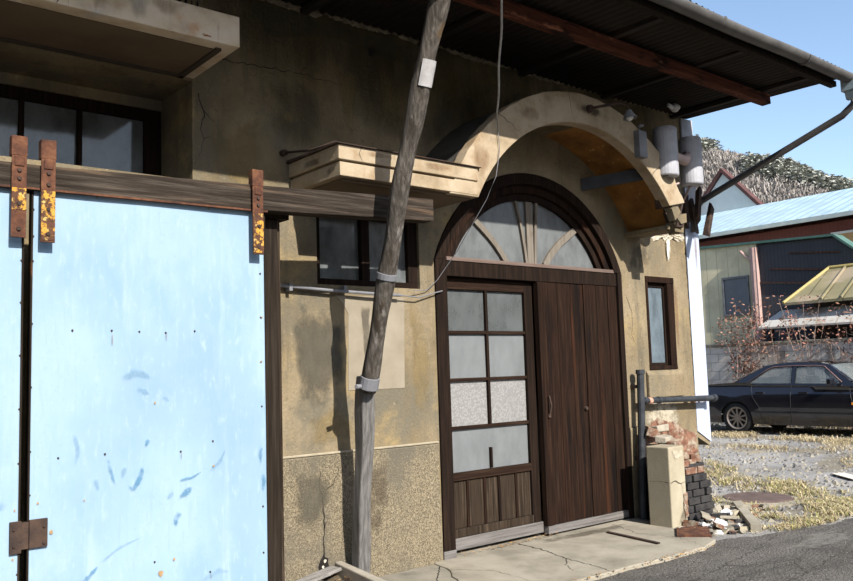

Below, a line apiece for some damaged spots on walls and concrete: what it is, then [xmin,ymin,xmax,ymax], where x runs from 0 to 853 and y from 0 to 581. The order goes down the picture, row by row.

leakage [297,321,342,390]
spalling [646,416,698,455]
crack [320,469,339,555]